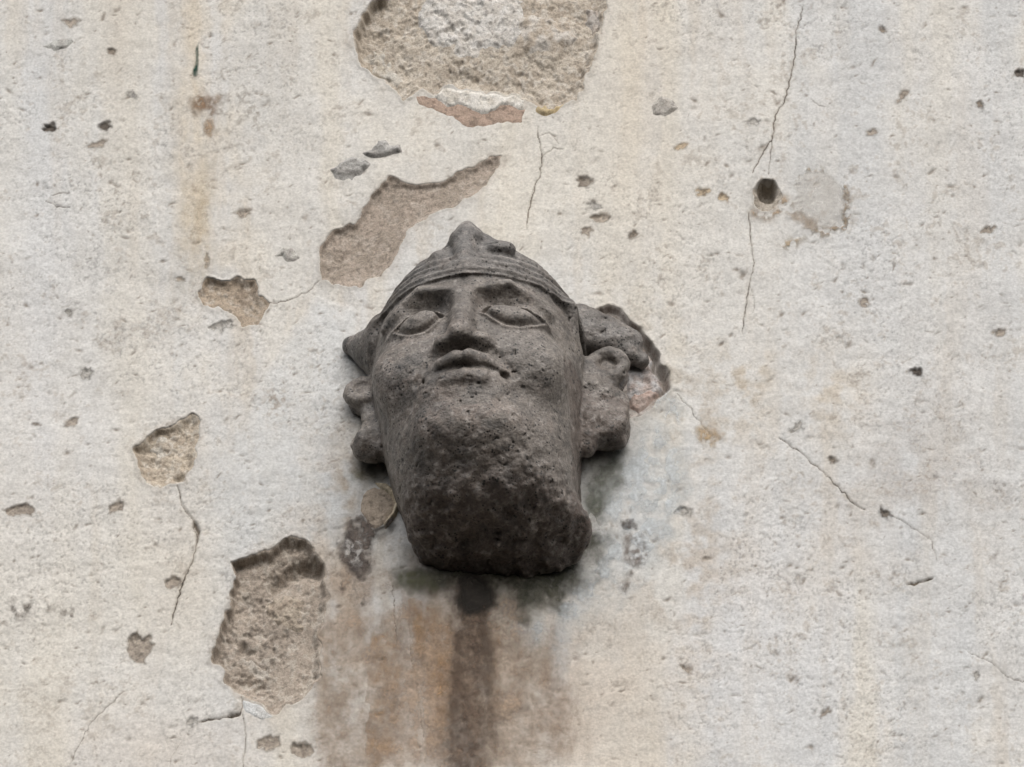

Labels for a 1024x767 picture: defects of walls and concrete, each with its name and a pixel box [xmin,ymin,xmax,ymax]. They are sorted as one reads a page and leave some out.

spalling [353,0,607,127]
crack [753,20,801,171]
peeling [319,156,501,288]
spalling [753,181,782,211]
spalling [198,254,270,332]
spalling [133,414,200,488]
spalling [211,536,330,720]
damp [343,572,561,767]